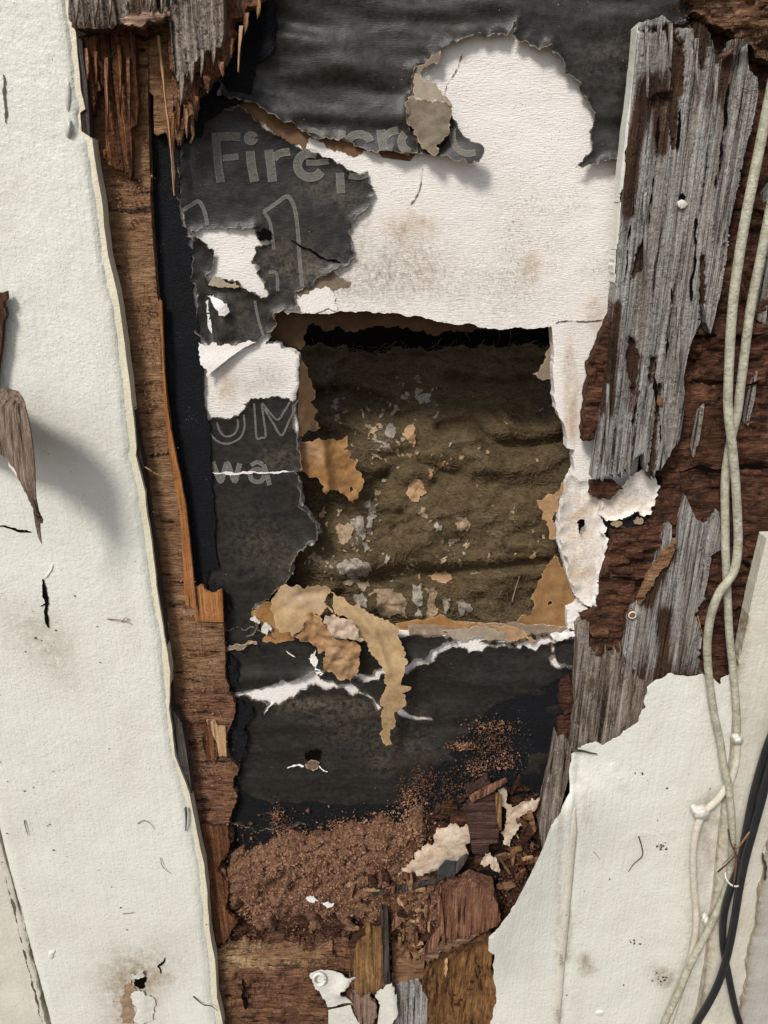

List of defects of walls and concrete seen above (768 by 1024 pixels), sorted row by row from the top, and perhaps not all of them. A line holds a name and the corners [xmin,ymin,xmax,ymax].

crack [291,240,341,263]
crack [0,524,31,532]
crack [40,579,50,628]
peeling [250,616,273,635]
peeling [130,971,156,1024]